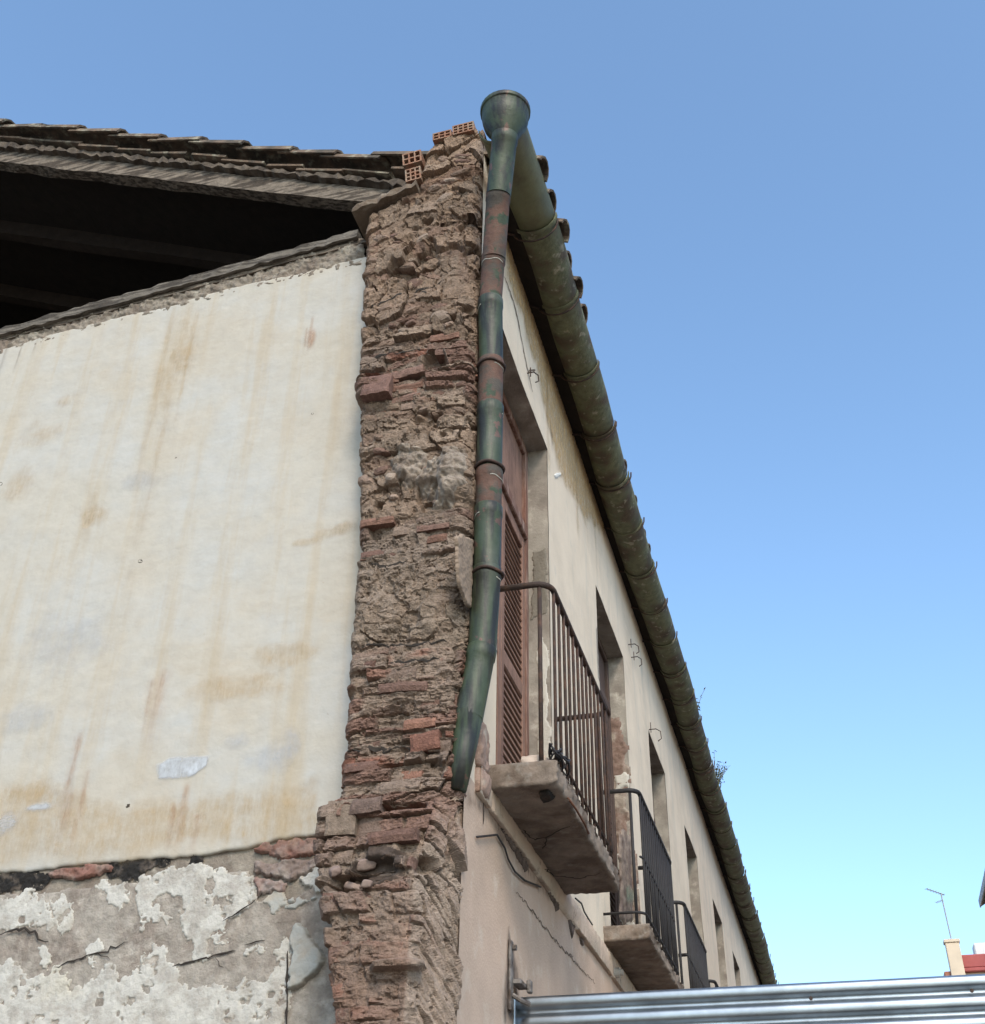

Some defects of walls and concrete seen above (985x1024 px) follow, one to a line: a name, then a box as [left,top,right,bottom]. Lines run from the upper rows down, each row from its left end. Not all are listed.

peeling [159,756,207,778]
flaking render [611,717,641,925]
crack [0,927,48,942]
peeling [0,888,74,936]
crack [58,942,124,968]
peeling [0,937,293,1024]
peeling [48,837,321,964]
crack [518,893,595,984]